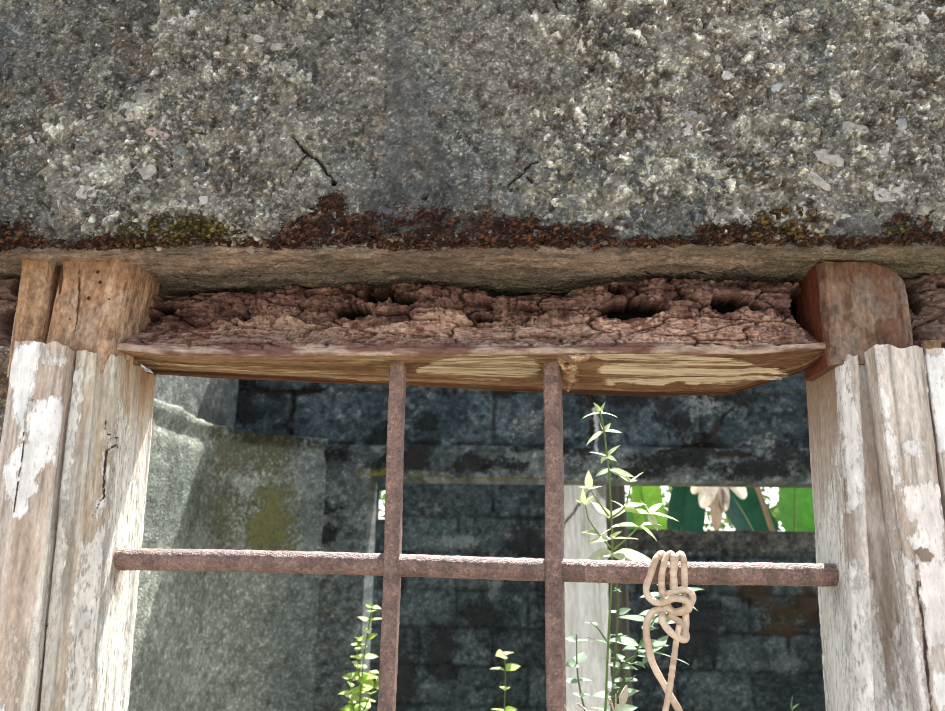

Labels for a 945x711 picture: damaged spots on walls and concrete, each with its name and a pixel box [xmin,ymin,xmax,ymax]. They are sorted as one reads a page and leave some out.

crack [294,139,335,184]
rust [0,190,945,253]
crack [508,162,539,187]
crack [93,420,119,516]
peeling [0,341,146,711]
peeling [815,348,945,711]